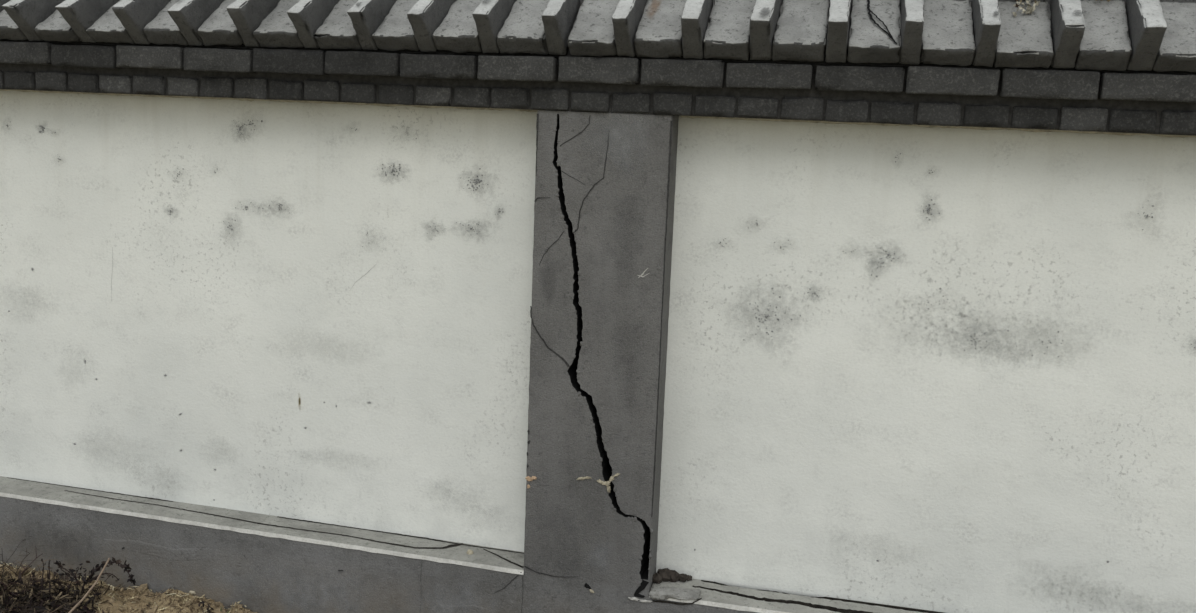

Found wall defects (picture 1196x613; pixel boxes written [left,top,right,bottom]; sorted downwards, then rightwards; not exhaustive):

crack [530,114,943,613]